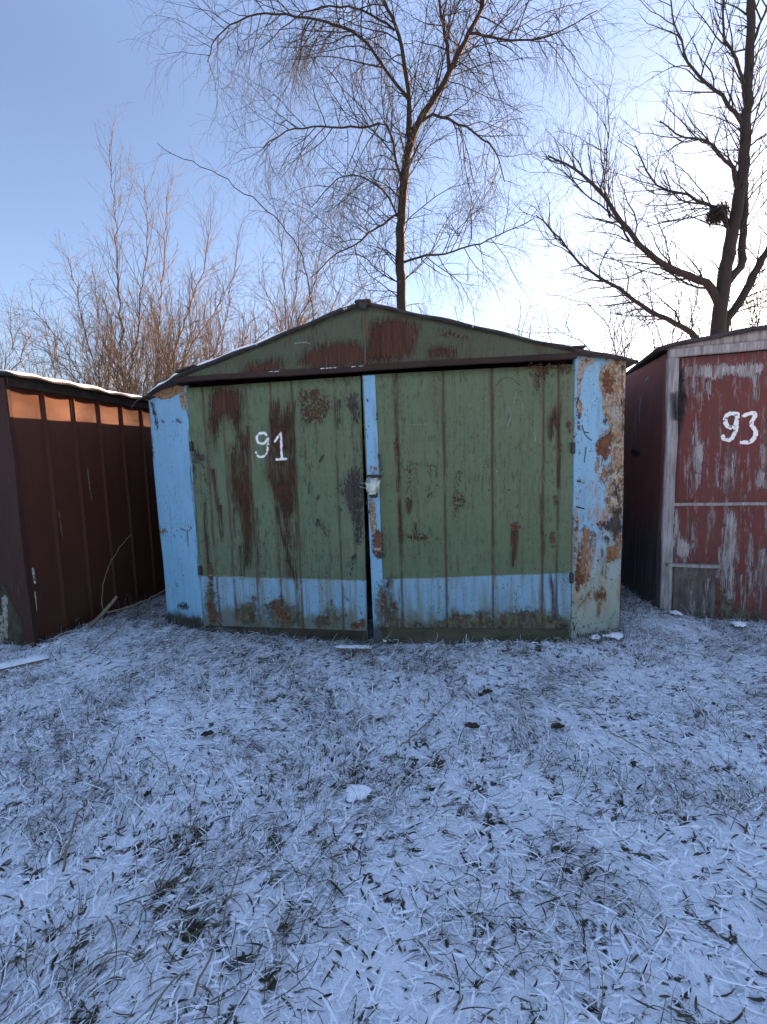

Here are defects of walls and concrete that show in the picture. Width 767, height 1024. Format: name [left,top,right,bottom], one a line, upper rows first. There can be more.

corrosion [297,318,419,369]
peeling [576,357,624,442]
peeling [685,361,765,402]
peeling [689,421,736,497]
peeling [754,444,767,489]
corrosion [190,386,259,626]
corrosion [267,388,330,626]
corrosion [372,529,384,559]
peeling [596,507,623,547]
peeling [673,507,767,616]